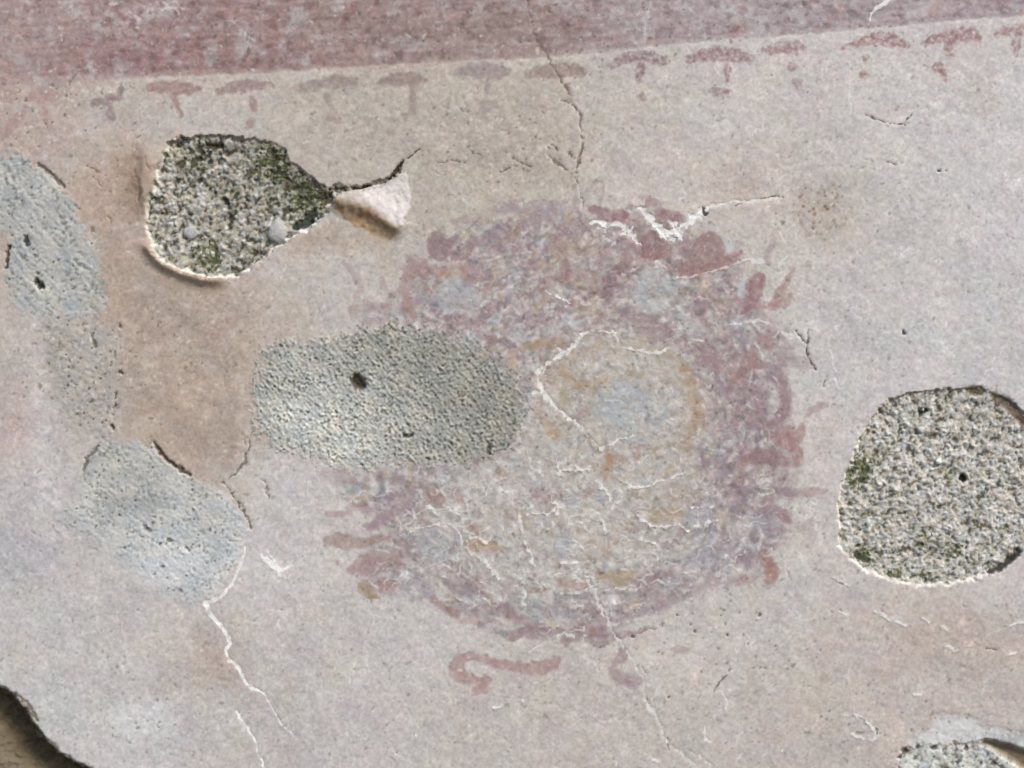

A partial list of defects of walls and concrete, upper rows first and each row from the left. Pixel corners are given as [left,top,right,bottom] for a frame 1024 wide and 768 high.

crack [526,0,788,283]
spalling [144,133,413,279]
damp [282,213,400,261]
spalling [350,372,366,392]
crack [727,318,841,391]
spalling [835,384,1024,589]
crack [202,430,295,768]
spalling [0,684,93,768]
spalling [894,711,1024,768]